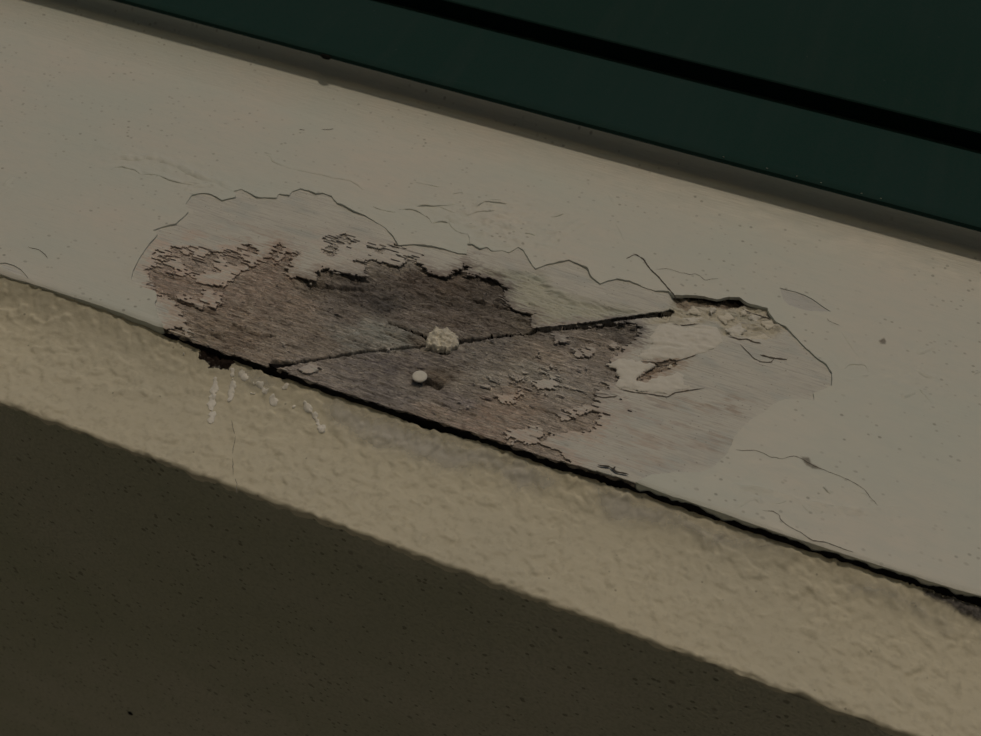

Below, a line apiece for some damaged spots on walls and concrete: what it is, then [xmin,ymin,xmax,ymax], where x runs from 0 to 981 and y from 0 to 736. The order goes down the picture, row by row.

peeling [132,189,832,488]